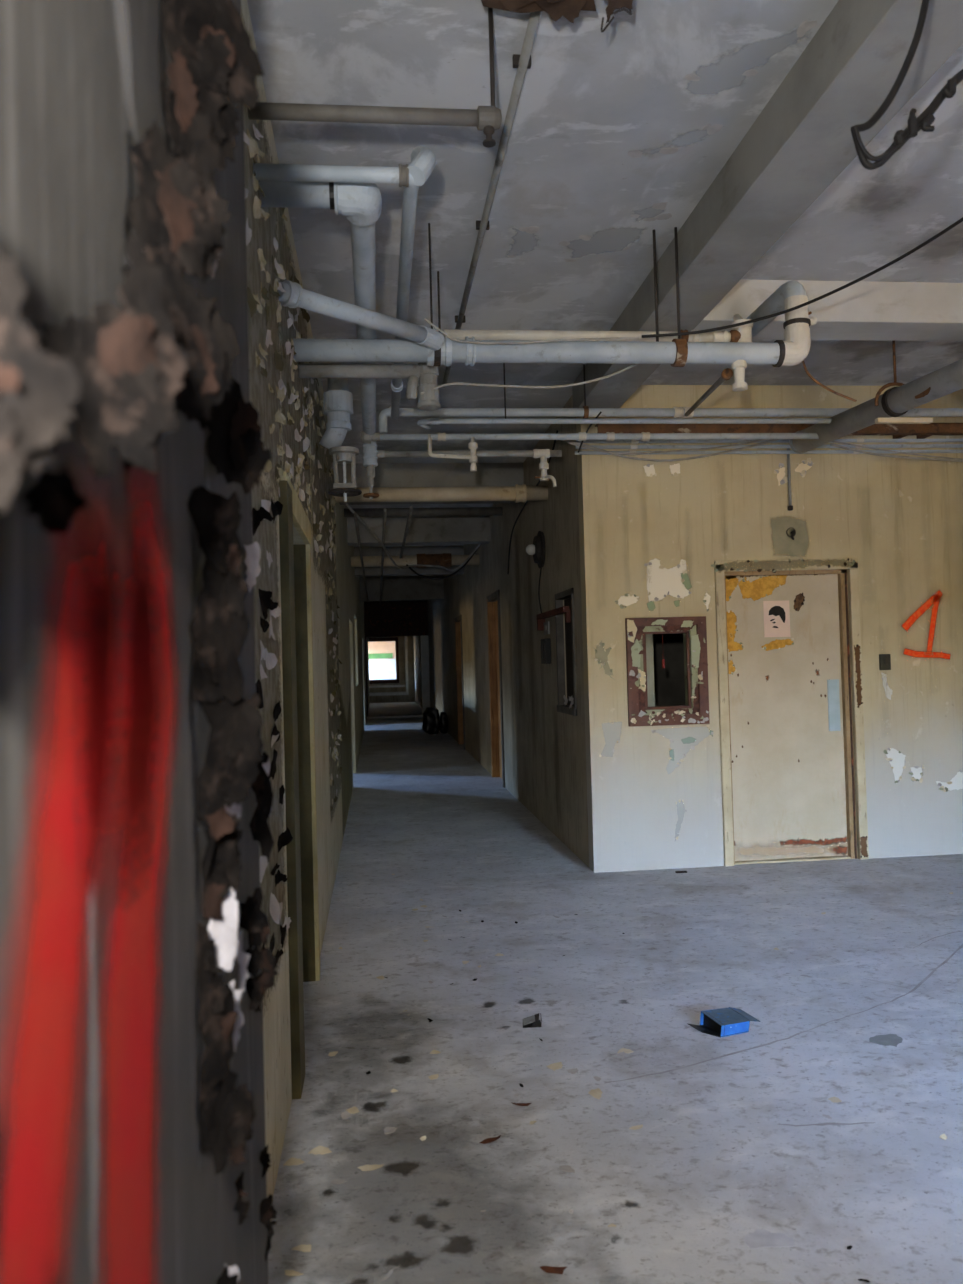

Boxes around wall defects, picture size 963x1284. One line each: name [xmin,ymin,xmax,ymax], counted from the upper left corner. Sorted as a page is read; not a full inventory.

peeling [0,0,342,1261]
peeling [594,641,645,689]
peeling [631,639,714,774]
peeling [615,558,855,675]
peeling [883,748,963,792]
peeling [216,1264,240,1284]